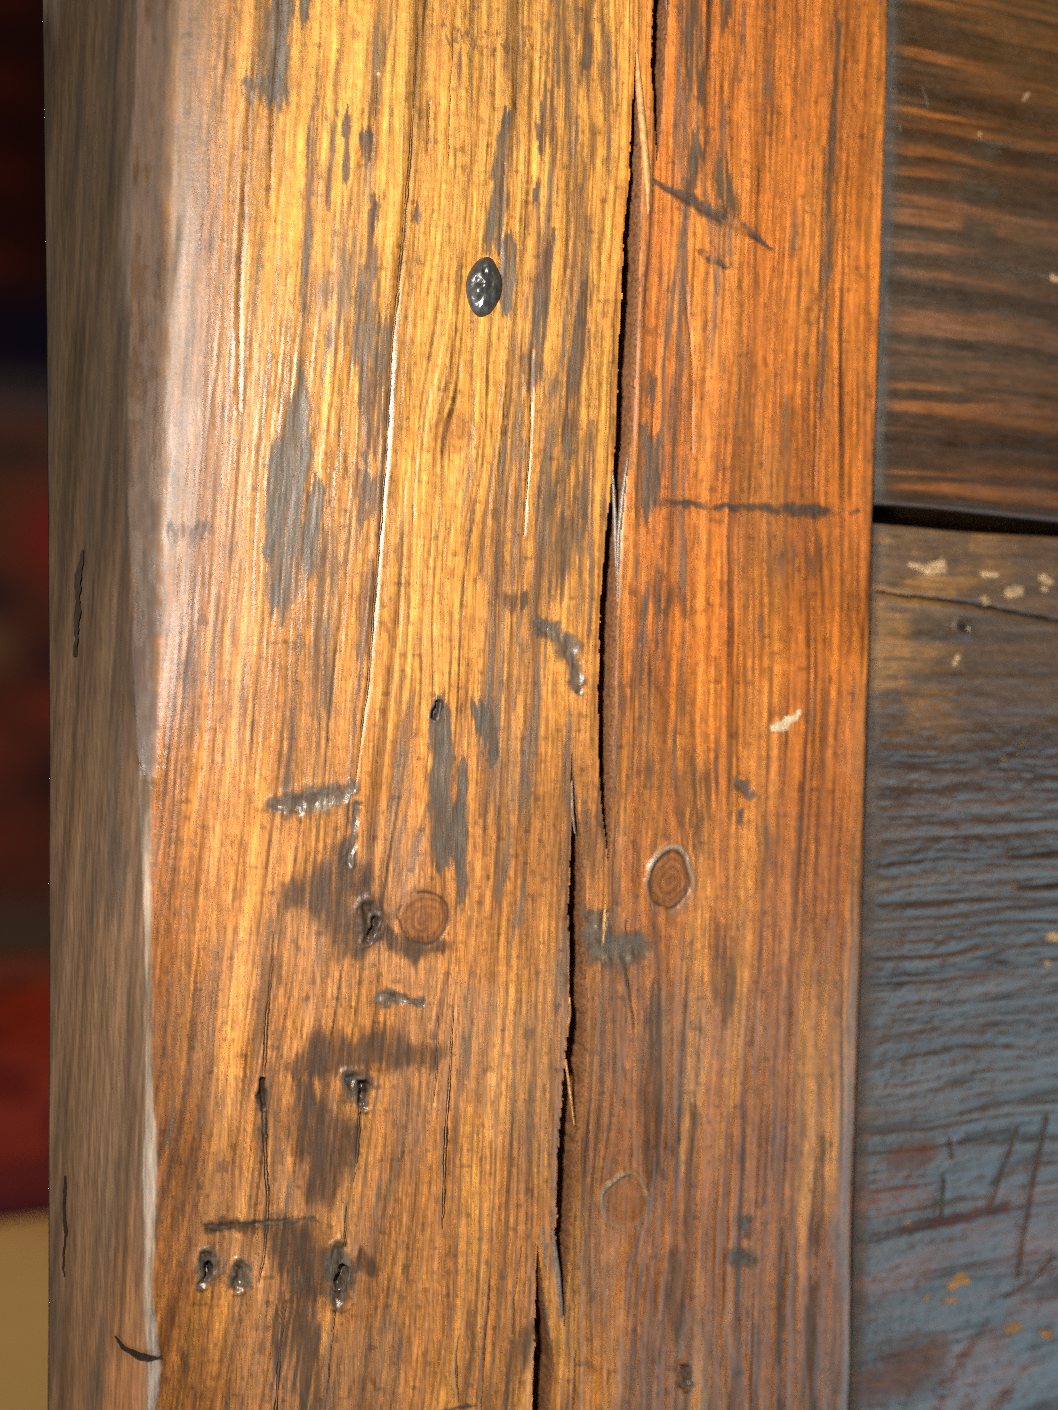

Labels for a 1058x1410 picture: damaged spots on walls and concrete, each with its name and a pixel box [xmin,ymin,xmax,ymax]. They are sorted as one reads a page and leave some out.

crack [685,287,693,452]
crack [814,152,825,489]
crack [455,0,670,1410]